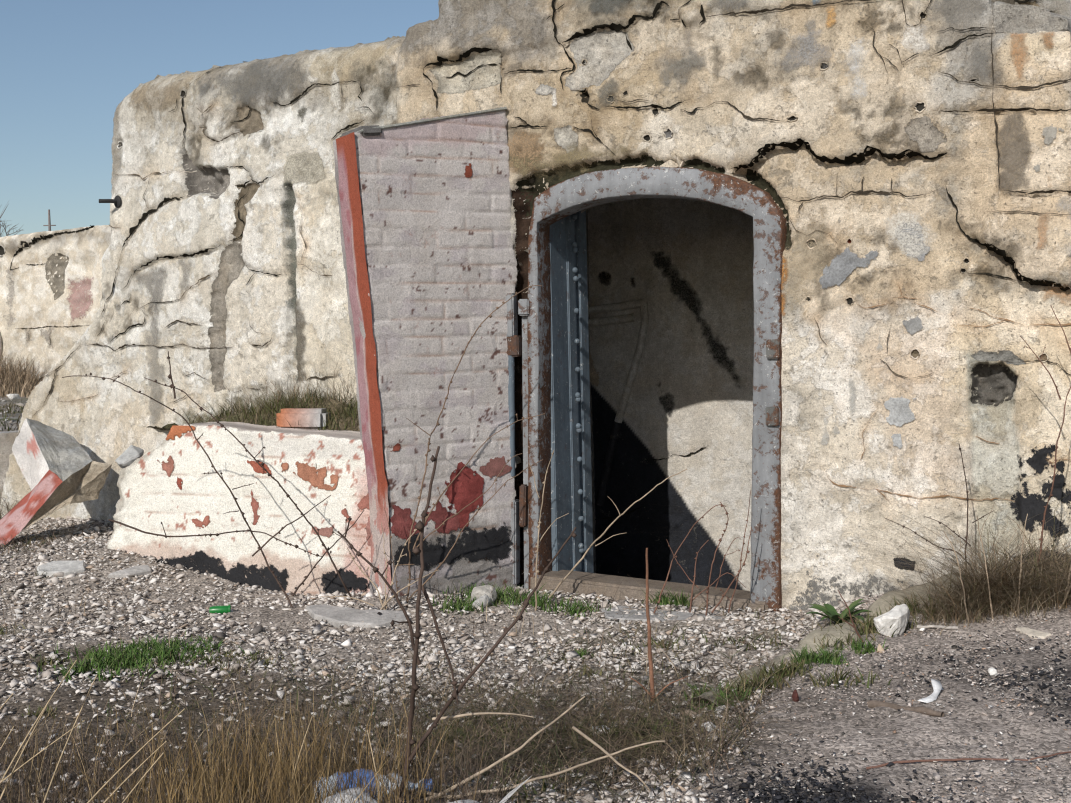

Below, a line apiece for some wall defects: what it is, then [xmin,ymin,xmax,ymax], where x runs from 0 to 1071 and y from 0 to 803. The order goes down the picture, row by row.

crack [396,0,1071,291]
crack [10,66,370,416]
spalling [45,253,69,300]
water stain [280,183,305,381]
crack [959,308,1071,375]
peeling [247,460,338,491]
spalling [276,408,331,430]
peeling [390,355,523,540]
crack [652,447,706,461]
crack [826,473,1015,502]
peeling [1009,442,1071,570]
peeling [321,566,369,595]